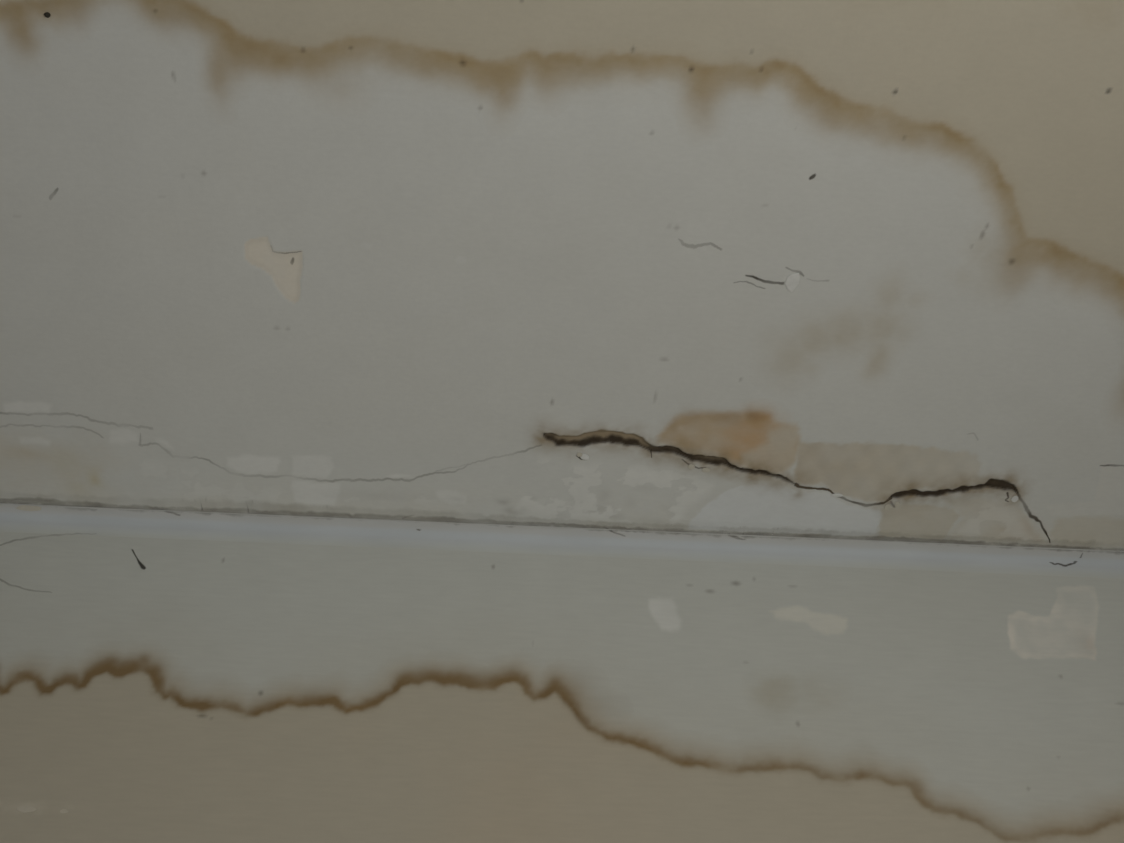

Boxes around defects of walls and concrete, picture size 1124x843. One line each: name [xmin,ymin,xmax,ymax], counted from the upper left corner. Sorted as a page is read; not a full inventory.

water stain [0,0,1124,534]
crack [522,412,1082,567]
water stain [0,532,1124,843]